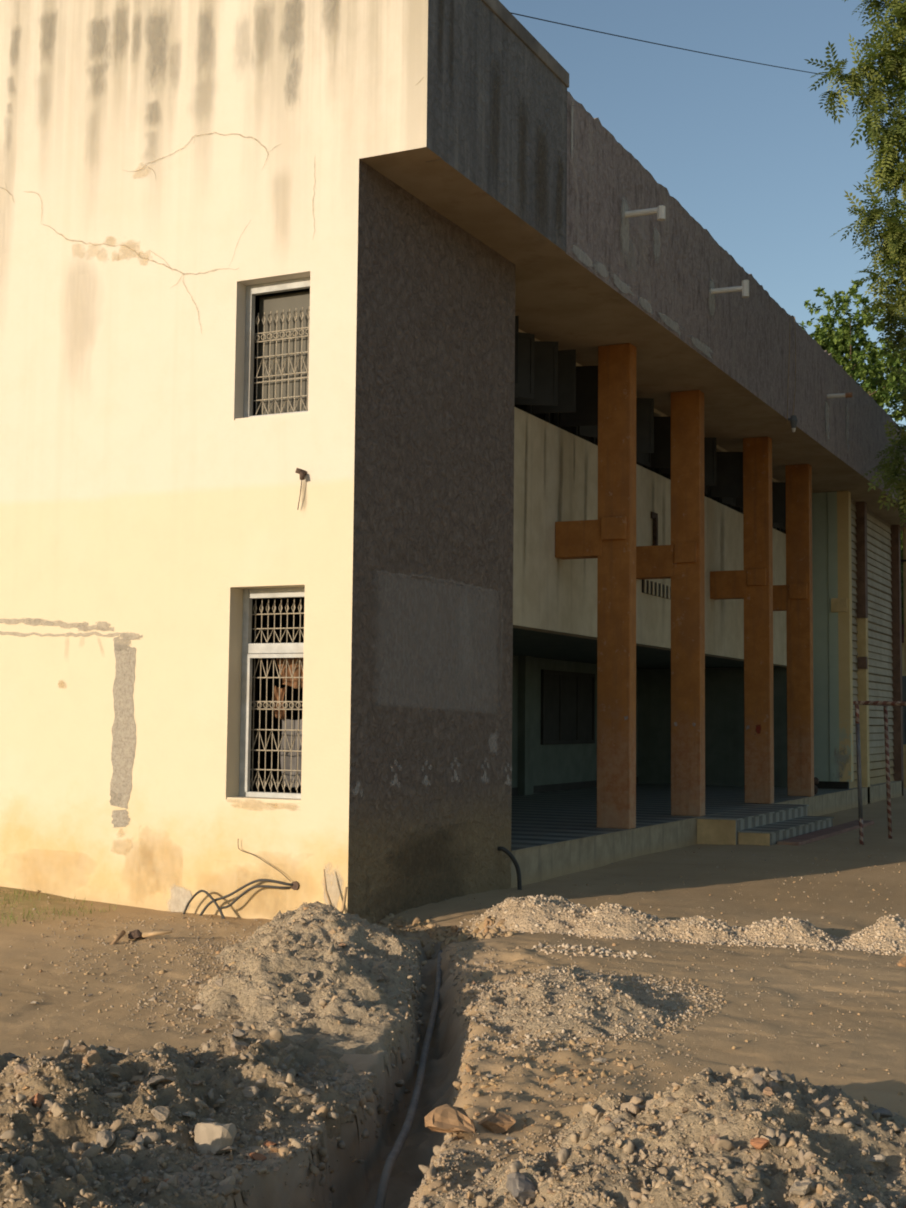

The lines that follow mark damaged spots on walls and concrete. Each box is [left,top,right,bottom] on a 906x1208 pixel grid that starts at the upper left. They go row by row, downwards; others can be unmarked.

damp [92,20,124,53]
damp [149,17,165,75]
damp [284,0,301,47]
flaking render [0,618,143,652]
peeling [110,790,130,828]